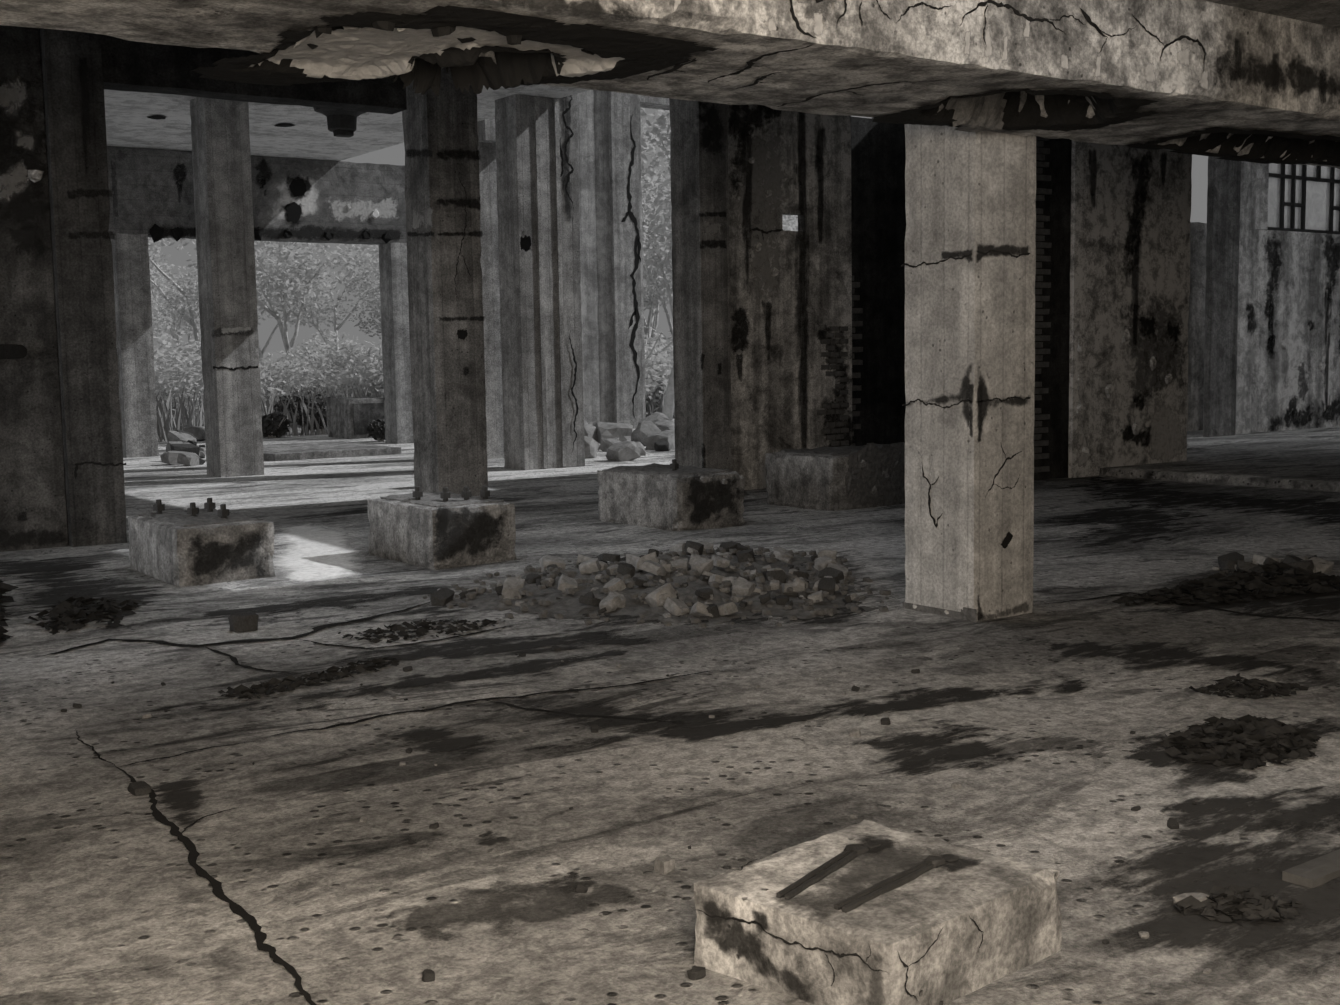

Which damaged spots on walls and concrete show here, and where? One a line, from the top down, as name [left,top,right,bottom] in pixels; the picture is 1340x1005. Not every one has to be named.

spalling [191,5,719,96]
spalling [790,0,847,38]
water stain [1089,149,1097,207]
spalling [1123,127,1340,166]
crack [621,115,641,420]
water stain [1124,152,1167,345]
water stain [1264,234,1282,359]
water stain [1269,235,1340,431]
crack [920,455,942,528]
crack [985,445,1022,497]
crack [75,669,728,1005]
water stain [1098,716,1340,963]